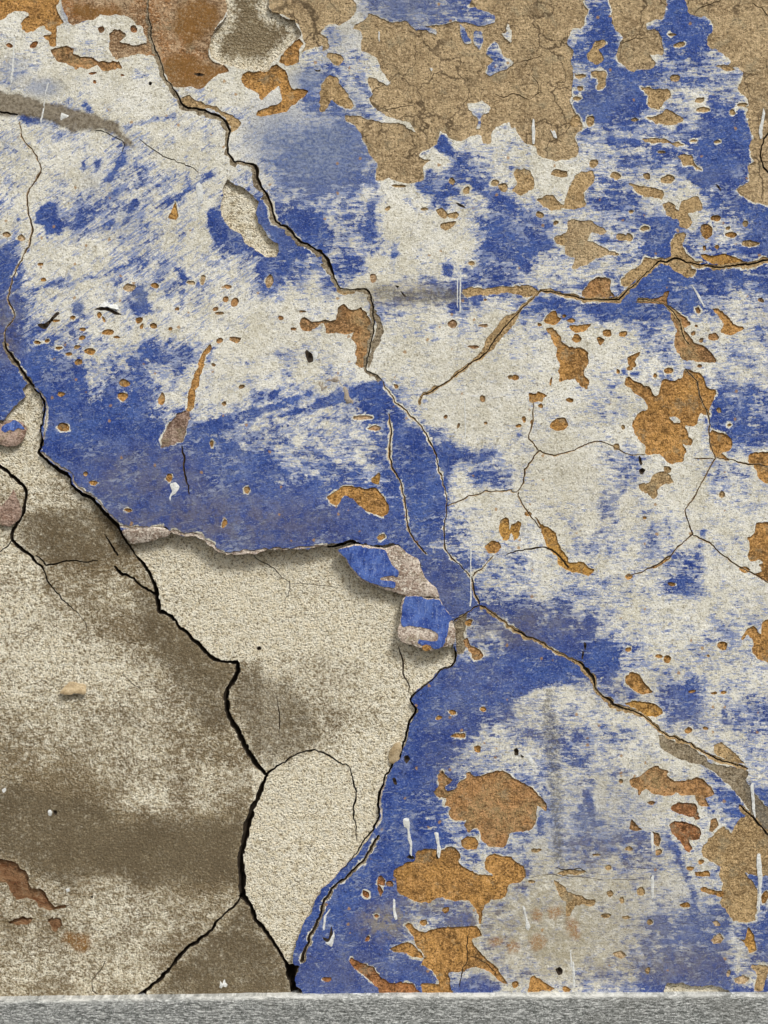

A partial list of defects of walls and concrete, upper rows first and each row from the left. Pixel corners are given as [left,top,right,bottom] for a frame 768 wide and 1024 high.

peeling [0,0,685,269]
peeling [685,0,768,206]
crack [146,0,768,770]
peeling [528,311,591,408]
peeling [616,291,744,499]
crack [0,111,457,994]
flaking render [0,376,483,996]
peeling [349,770,571,993]
crack [459,934,498,987]
crack [532,867,637,881]
peeling [619,726,768,992]
crack [739,804,768,838]